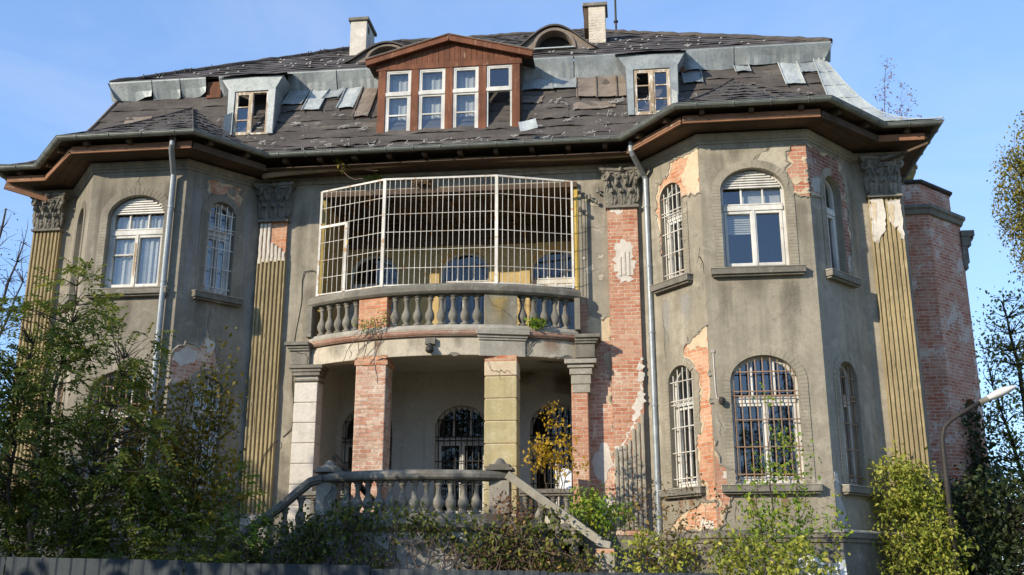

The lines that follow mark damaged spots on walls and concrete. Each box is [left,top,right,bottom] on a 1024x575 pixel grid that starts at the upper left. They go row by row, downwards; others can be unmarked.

flaking render [654,147,702,255]
flaking render [755,141,853,274]
flaking render [869,198,905,243]
flaking render [168,329,223,388]
flaking render [670,324,738,533]